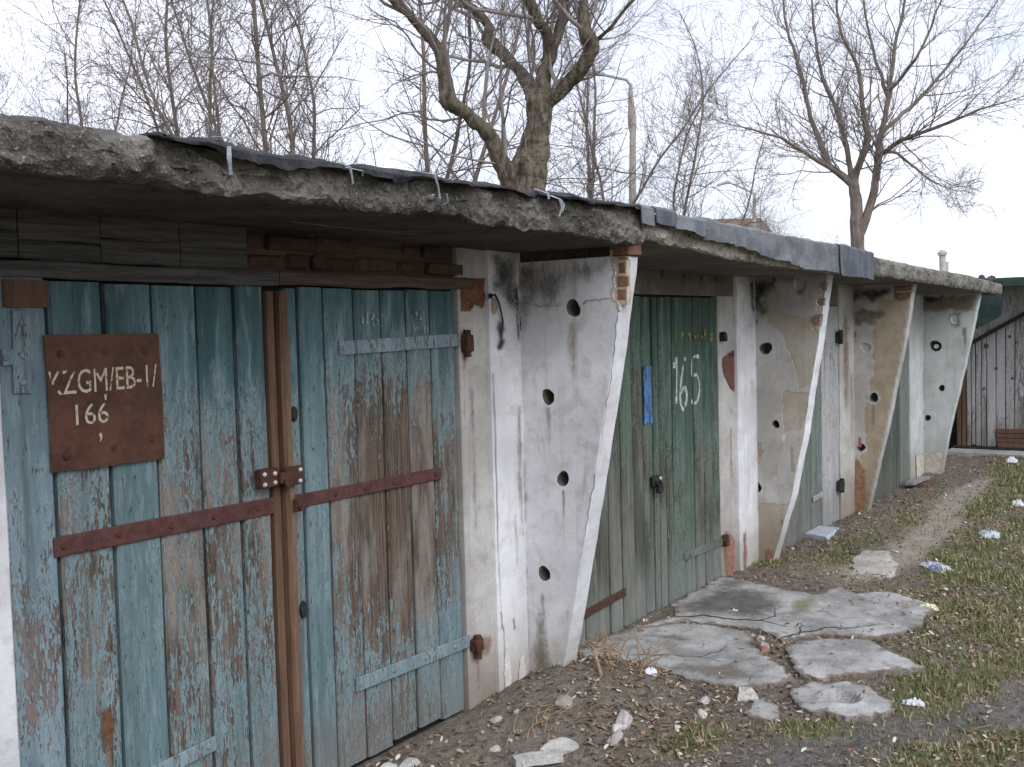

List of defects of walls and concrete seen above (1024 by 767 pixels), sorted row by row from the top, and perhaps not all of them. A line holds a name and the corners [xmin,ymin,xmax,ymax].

spalling [461,277,498,314]
spalling [723,350,735,391]
flaking render [761,281,825,472]
flaking render [855,285,914,512]
crack [677,607,874,641]